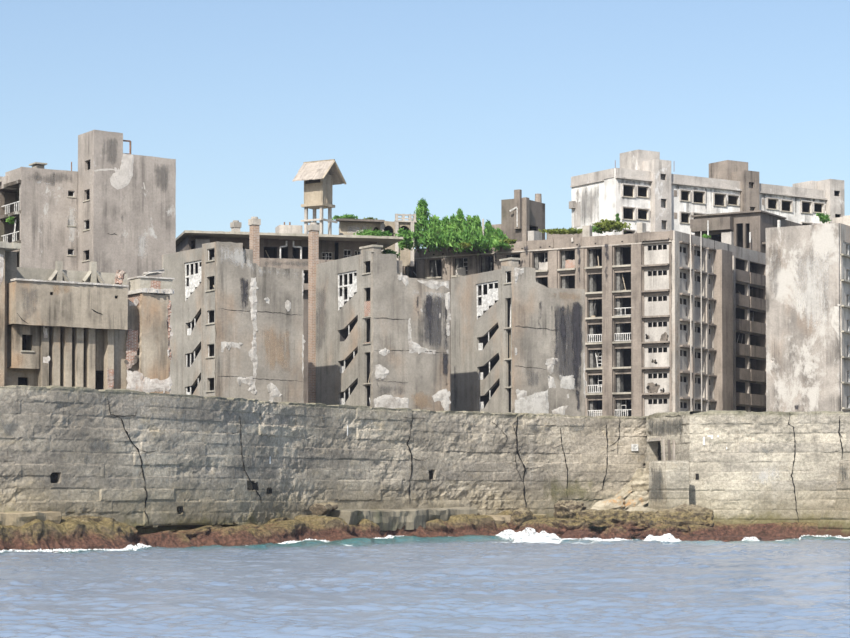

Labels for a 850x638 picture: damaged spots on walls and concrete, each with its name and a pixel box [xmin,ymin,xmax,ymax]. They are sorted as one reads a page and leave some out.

peeling [94,153,134,190]
peeling [124,299,173,393]
leakage [417,293,448,375]
peeling [515,352,587,415]
leakage [555,302,582,409]
crack [107,396,155,524]
crack [224,420,262,503]
crack [403,417,426,497]
crack [492,417,539,506]
crack [555,428,568,498]
crack [602,418,620,492]
crack [786,417,799,522]